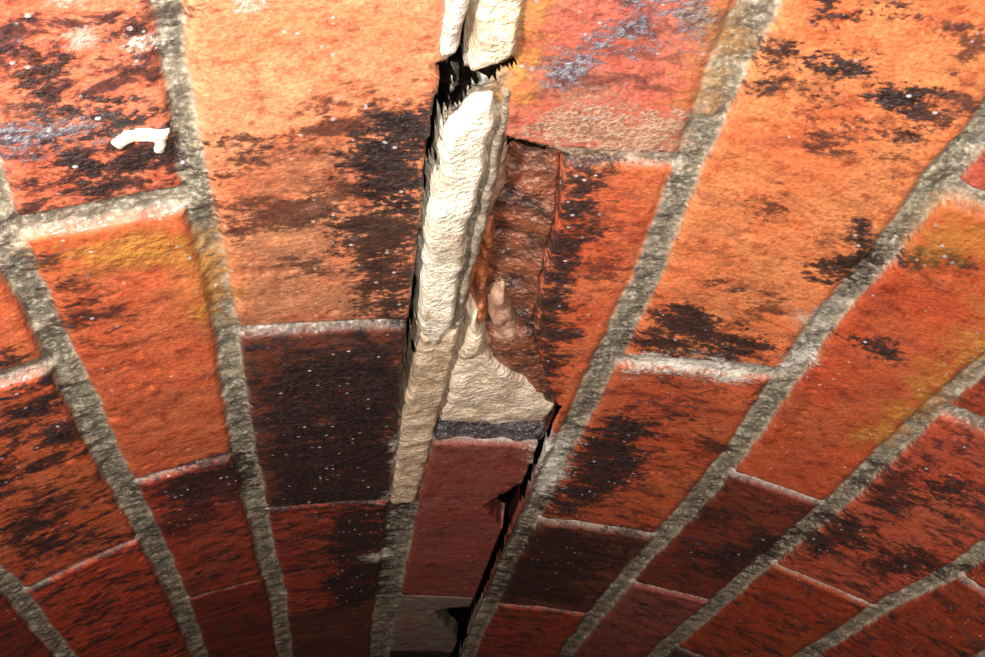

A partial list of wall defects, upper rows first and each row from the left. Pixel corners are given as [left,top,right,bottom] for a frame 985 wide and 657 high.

crack [401,36,517,374]
spalling [434,135,561,442]
damp [360,548,393,562]
crack [448,403,564,657]